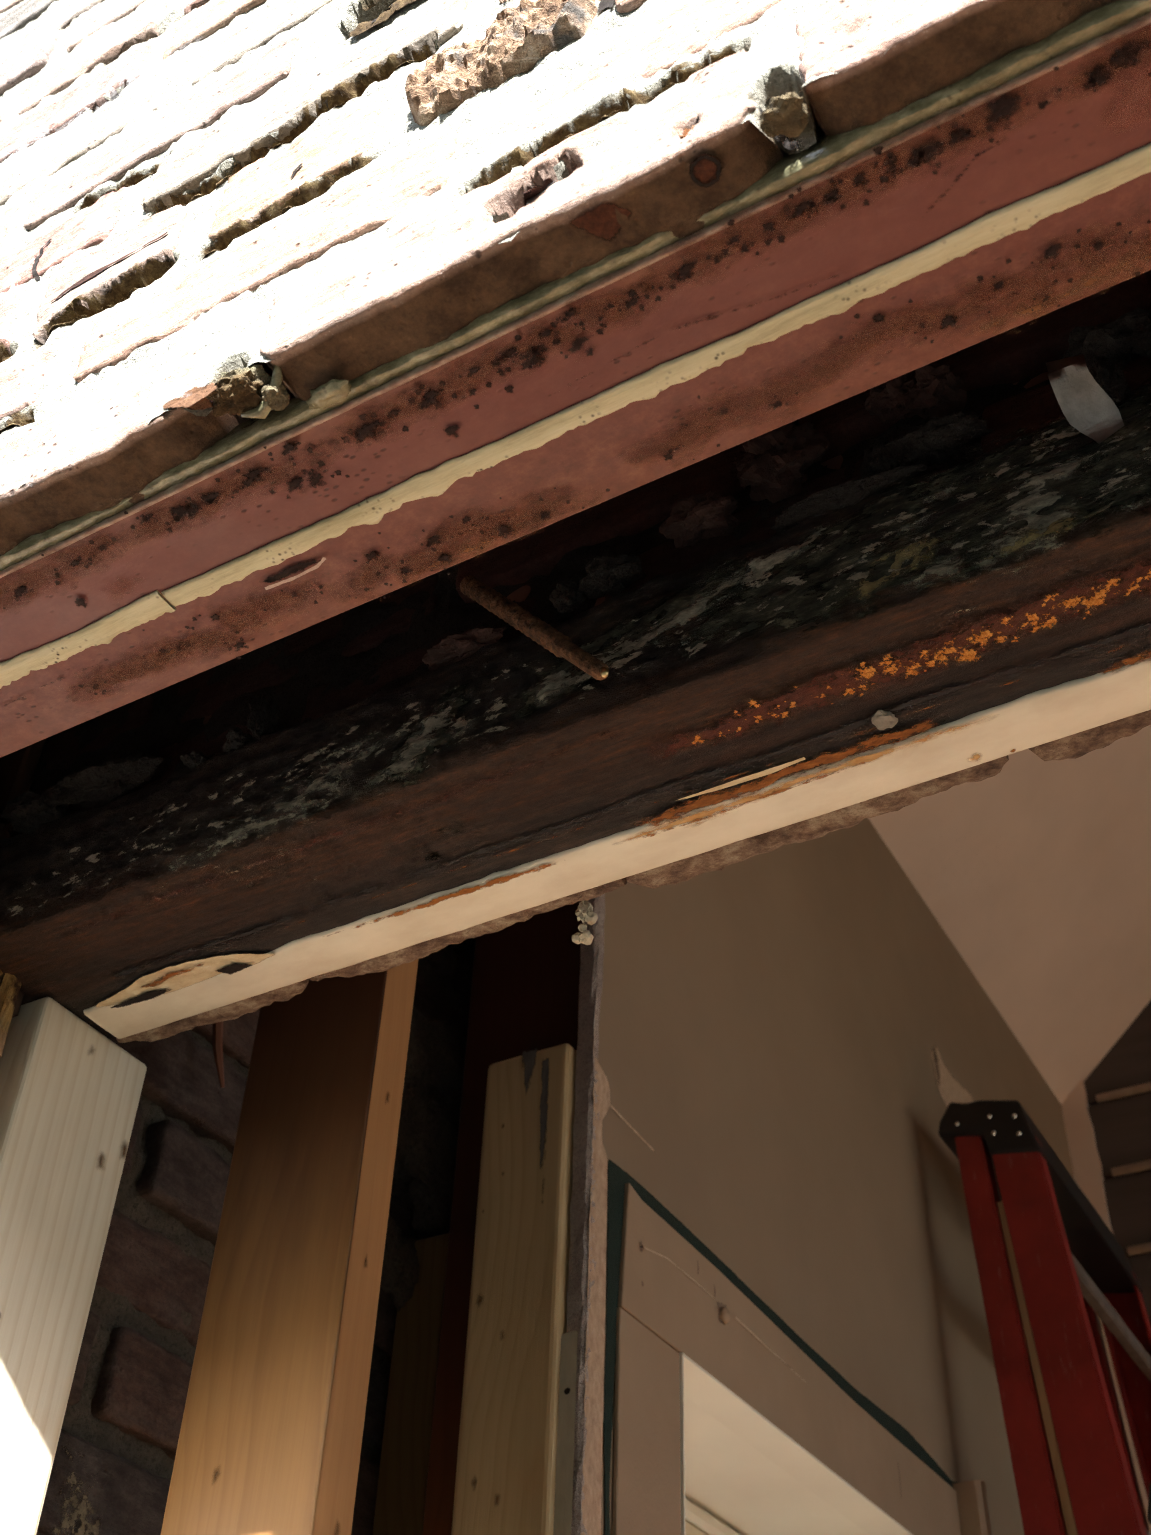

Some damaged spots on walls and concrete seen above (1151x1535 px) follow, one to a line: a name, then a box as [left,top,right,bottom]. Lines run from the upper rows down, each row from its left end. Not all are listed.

spalling [405,0,600,126]
spalling [162,365,290,417]
rust [0,24,1151,609]
peeling [264,557,326,590]
leakage [8,381,1151,916]
rust [647,559,1151,760]
spalling [1028,710,1151,761]
spalling [96,755,1009,1535]